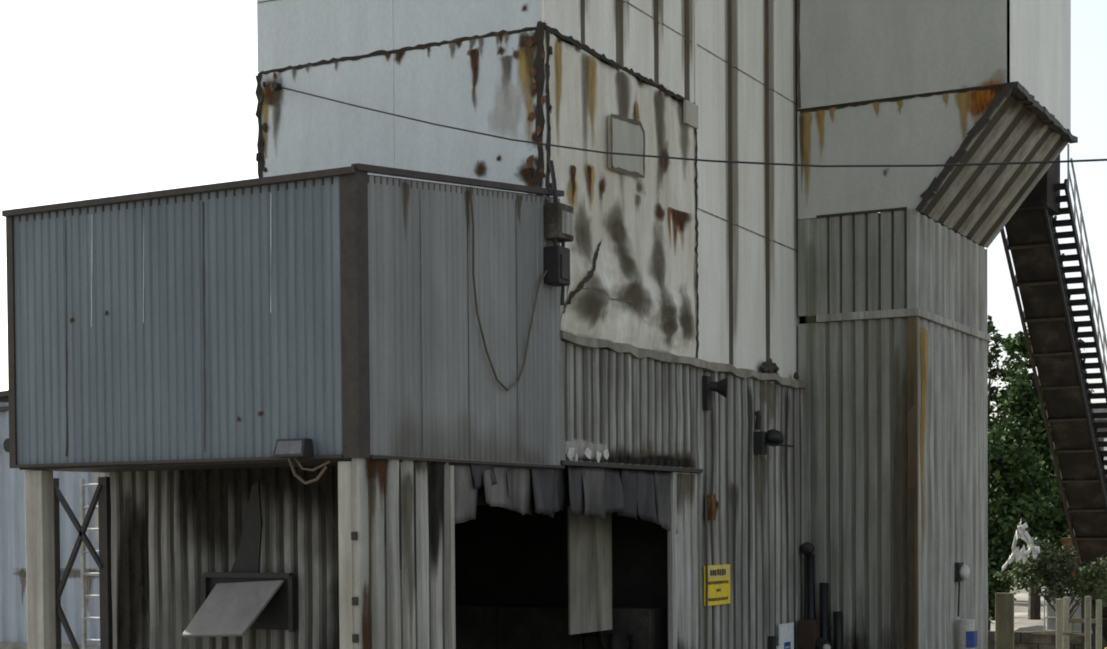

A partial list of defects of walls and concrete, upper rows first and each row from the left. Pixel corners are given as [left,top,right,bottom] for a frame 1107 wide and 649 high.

rust [800,81,1046,184]
rust [257,24,699,358]
damp [577,208,592,253]
damp [577,277,603,321]
damp [611,206,695,342]
peeling [565,440,609,463]
rust [894,328,927,649]